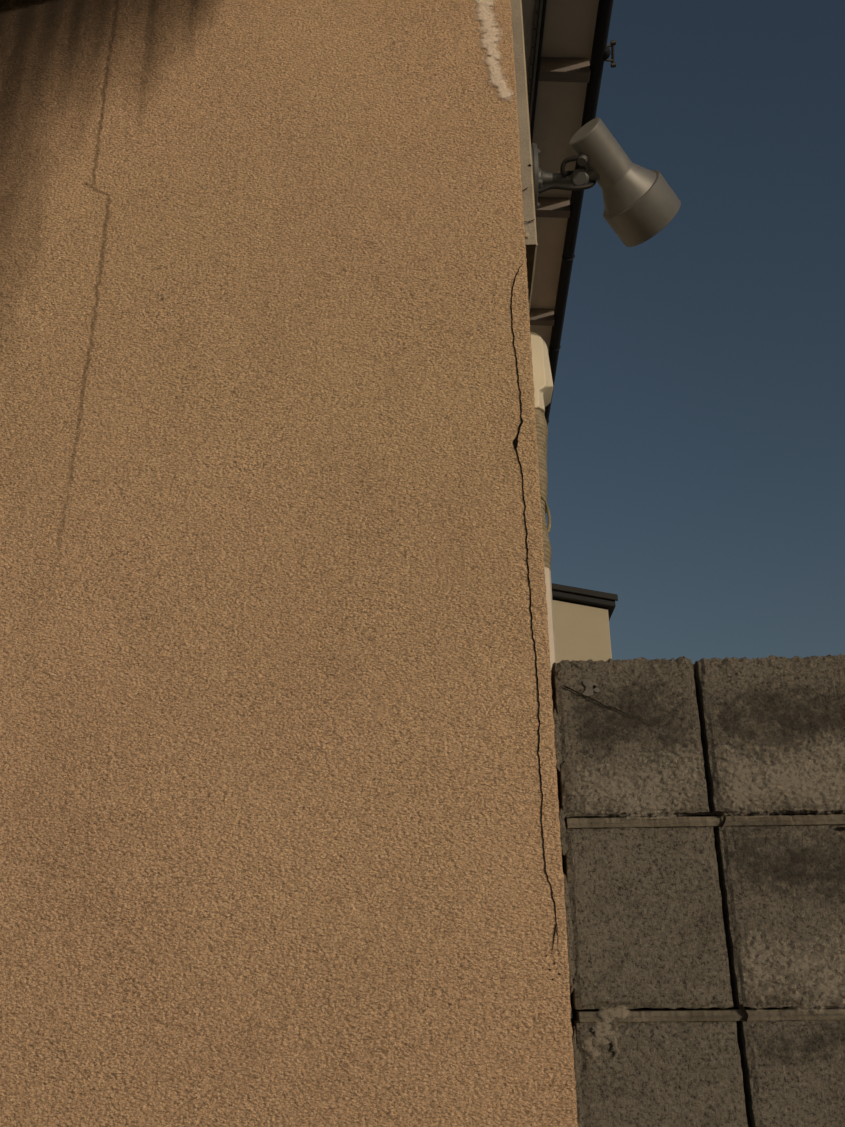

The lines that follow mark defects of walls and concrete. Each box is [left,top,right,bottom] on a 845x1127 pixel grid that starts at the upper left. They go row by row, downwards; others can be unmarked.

leakage [0,0,170,110]
crack [476,0,514,99]
crack [510,219,626,980]